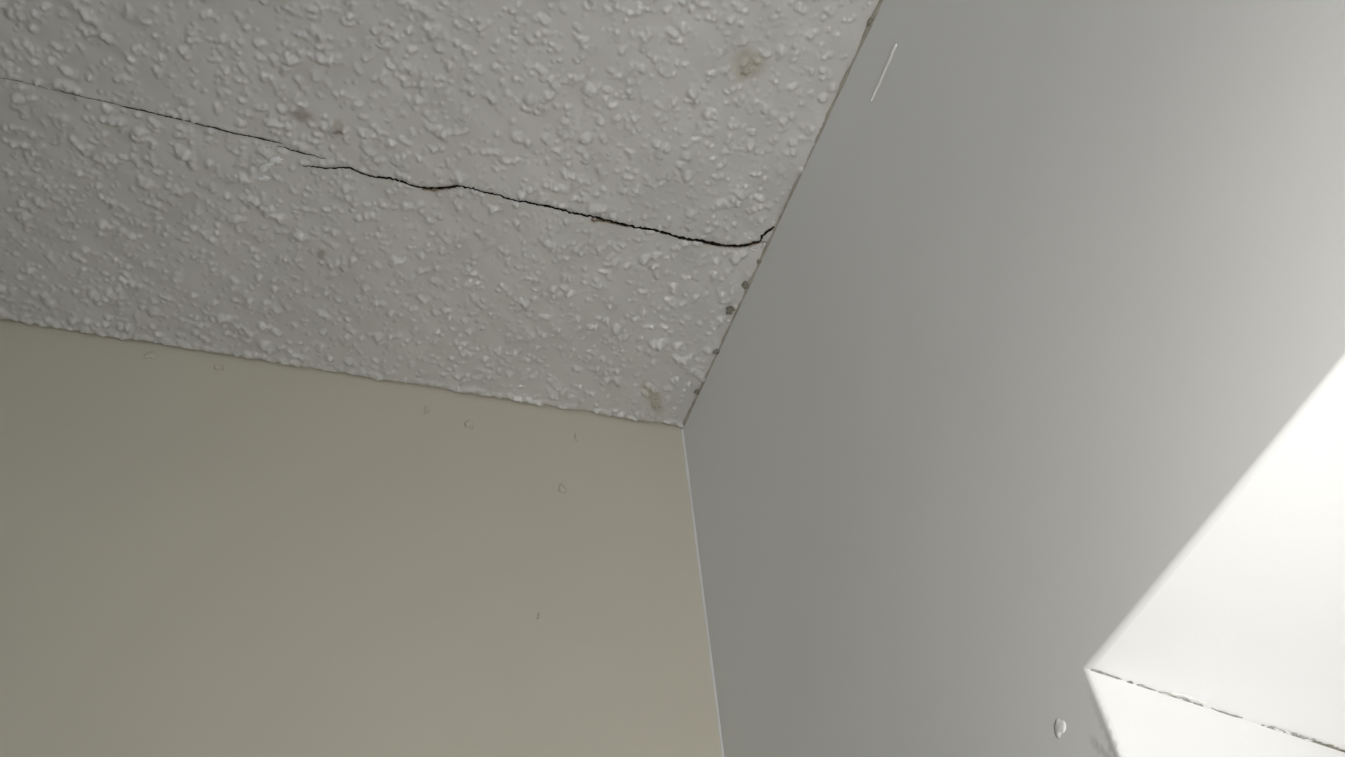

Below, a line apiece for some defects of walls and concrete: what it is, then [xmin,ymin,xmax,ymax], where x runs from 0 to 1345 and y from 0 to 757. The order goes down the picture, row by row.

crack [2,78,775,252]